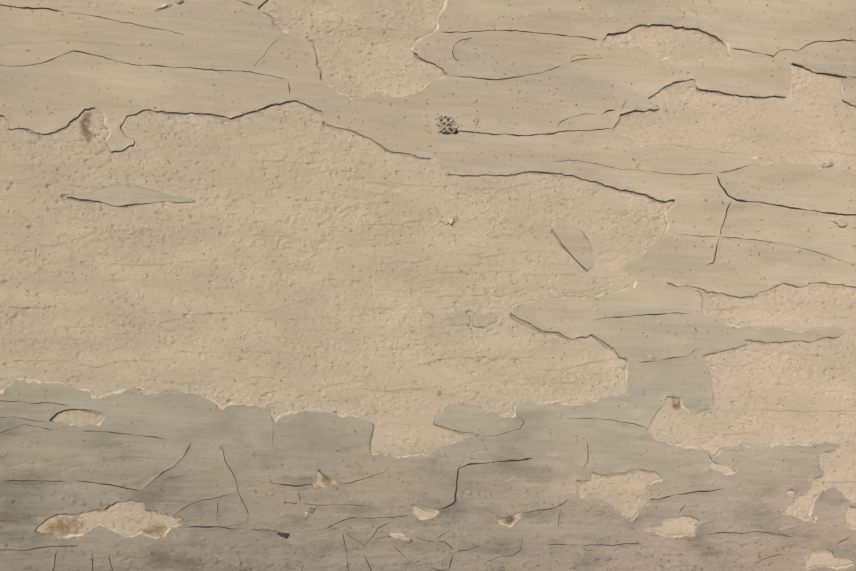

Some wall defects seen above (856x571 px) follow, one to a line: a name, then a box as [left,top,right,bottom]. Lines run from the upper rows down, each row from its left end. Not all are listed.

crack [0,1,187,38]
crack [0,31,293,97]
crack [438,27,604,83]
peeling [600,21,732,61]
crack [457,97,629,139]
peeling [611,60,856,175]
crack [549,157,856,268]
peeling [0,97,678,458]
peeling [647,278,856,530]
peeling [30,496,188,540]
crack [265,414,649,571]
peeling [573,466,663,521]